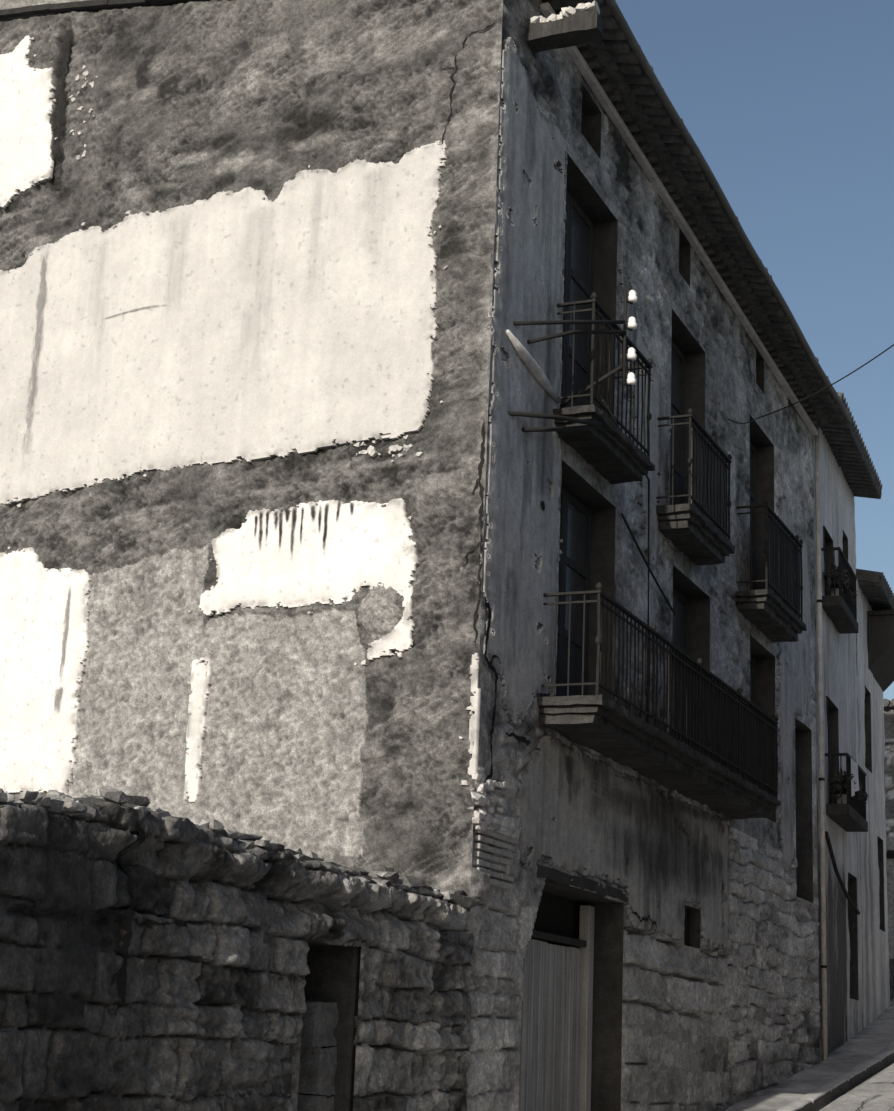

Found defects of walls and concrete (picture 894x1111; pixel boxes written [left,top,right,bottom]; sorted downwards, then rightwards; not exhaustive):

peeling [0,35,99,209]
leakage [51,30,73,160]
crack [442,19,498,143]
leakage [27,259,46,428]
peeling [0,140,449,508]
peeling [0,546,92,795]
leakage [60,588,70,672]
peeling [184,645,212,802]
leakage [254,501,353,552]
peeling [188,498,419,665]
peeling [459,37,730,956]
peeling [776,495,812,877]